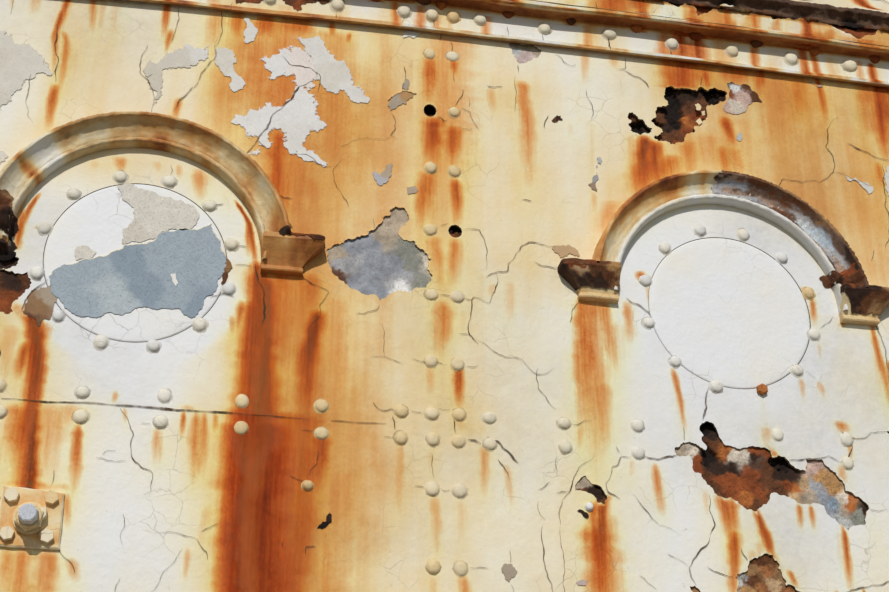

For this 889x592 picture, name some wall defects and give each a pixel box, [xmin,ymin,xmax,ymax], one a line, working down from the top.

spalling [661,0,889,39]
peeling [231,36,370,167]
corrosion [0,189,31,314]
peeling [23,183,232,326]
corrosion [305,314,319,367]
crack [439,229,558,407]
corrosion [819,263,889,316]
corrosion [25,317,42,489]
crack [613,432,685,467]
spalling [675,422,868,530]
crack [541,529,565,592]
crack [670,495,732,584]